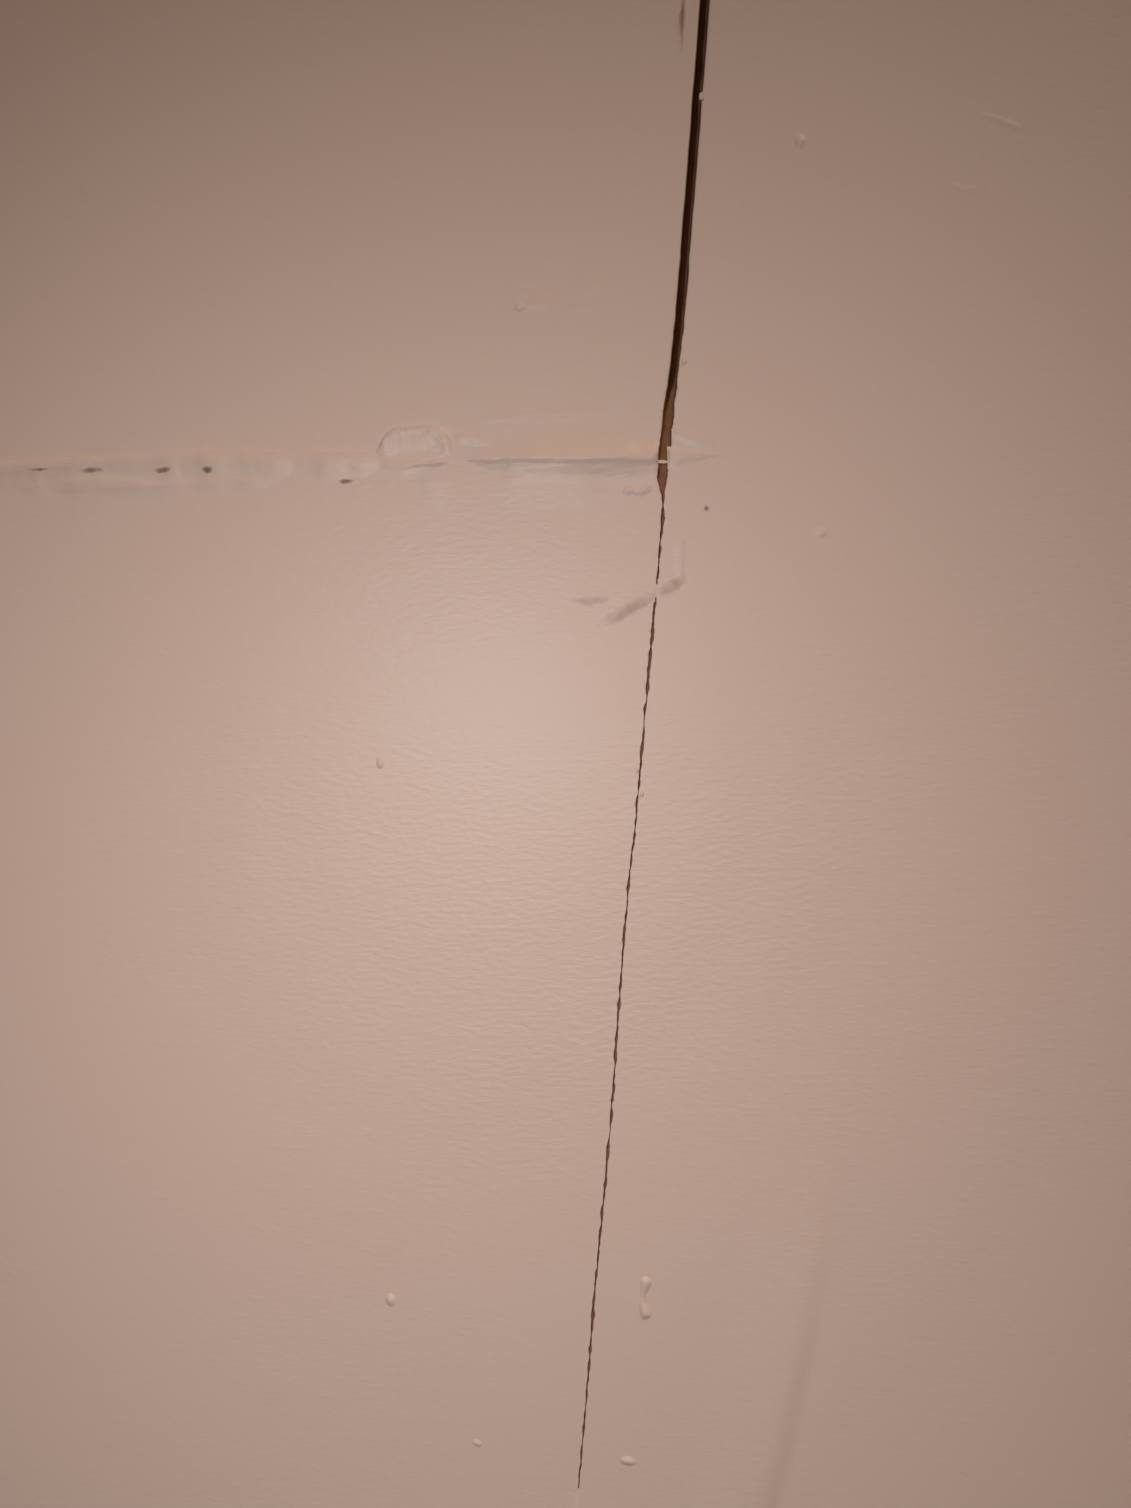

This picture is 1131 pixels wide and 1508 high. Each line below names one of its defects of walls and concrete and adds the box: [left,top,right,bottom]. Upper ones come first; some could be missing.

crack [572,0,709,1508]